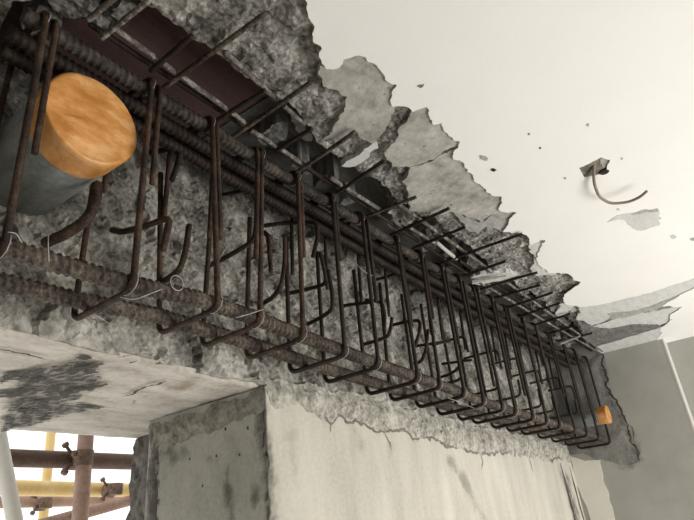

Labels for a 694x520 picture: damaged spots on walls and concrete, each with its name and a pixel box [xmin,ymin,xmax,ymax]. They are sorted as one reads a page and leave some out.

spalling [0,44,35,127]
spalling [0,0,148,101]
spalling [51,52,147,119]
spalling [87,0,694,433]
spalling [0,355,108,432]
spalling [552,422,586,440]